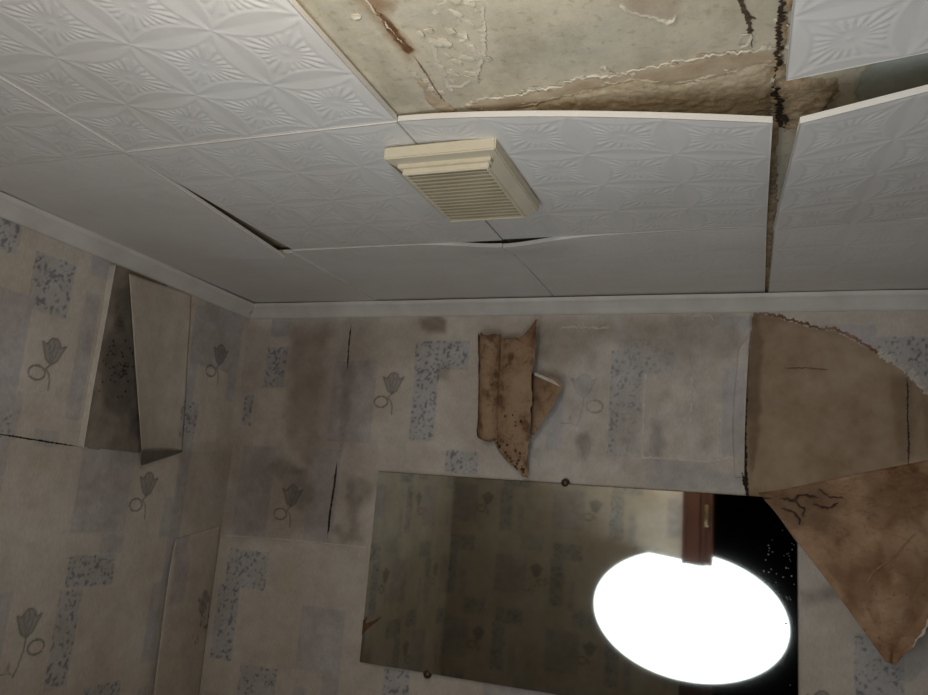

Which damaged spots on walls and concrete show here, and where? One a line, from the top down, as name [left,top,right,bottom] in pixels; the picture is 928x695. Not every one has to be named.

flaking render [411,0,840,292]
crack [737,0,756,46]